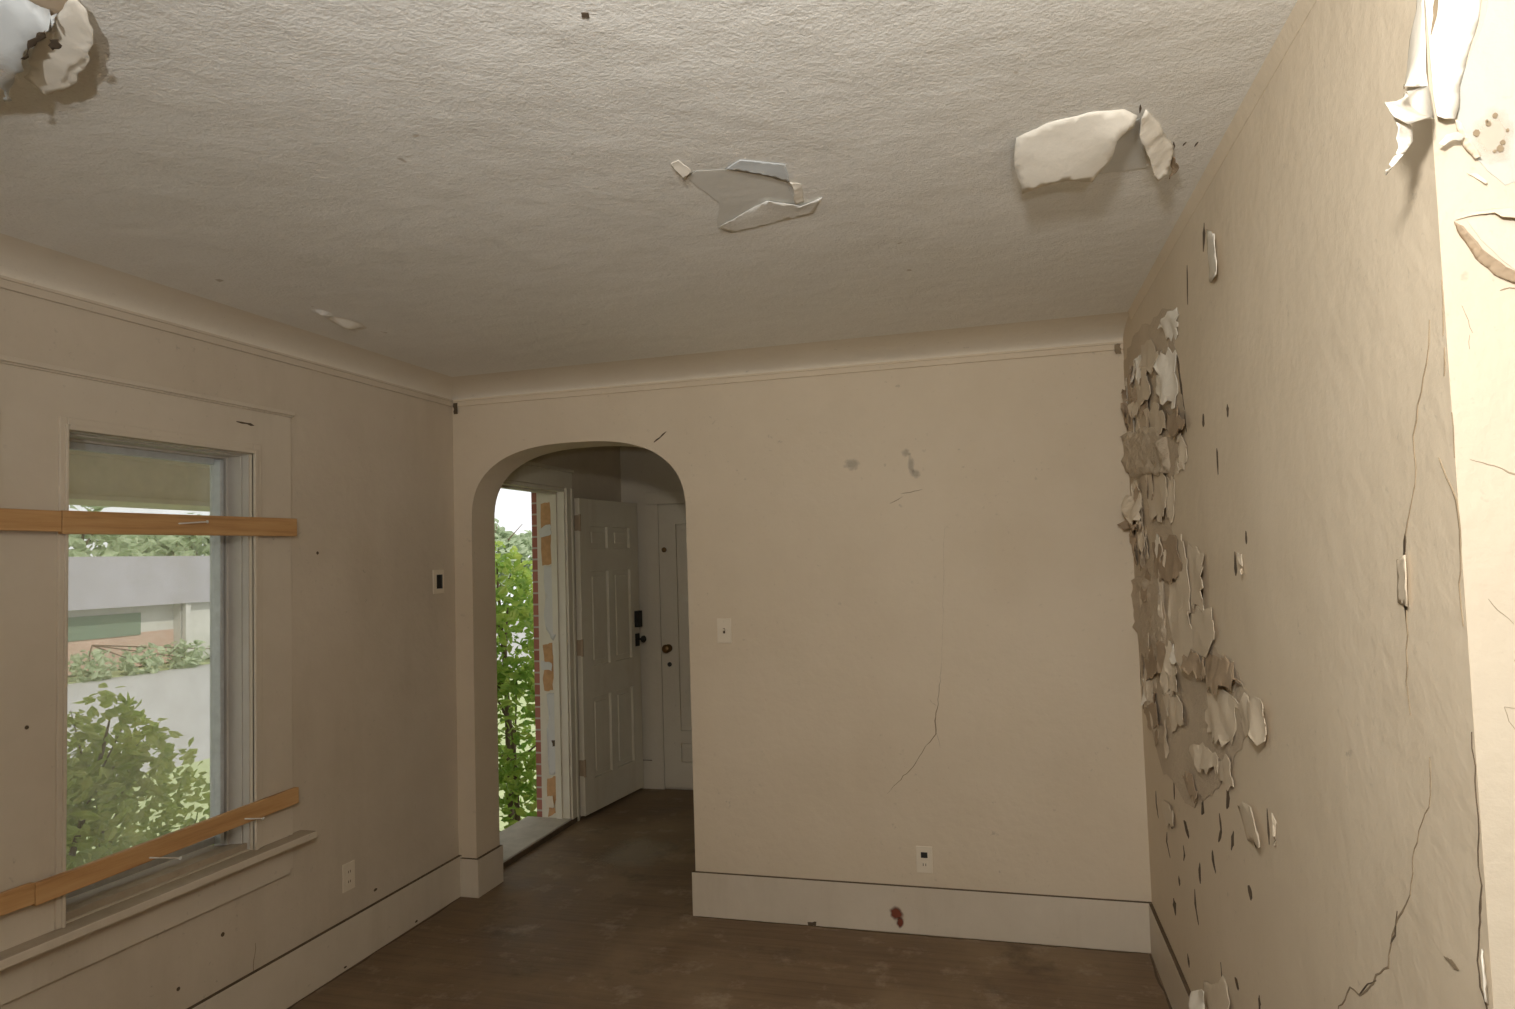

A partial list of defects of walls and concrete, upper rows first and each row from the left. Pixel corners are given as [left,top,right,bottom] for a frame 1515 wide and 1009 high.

peeling [0,0,94,102]
peeling [670,160,822,233]
peeling [1014,104,1198,194]
peeling [1384,0,1515,185]
peeling [1454,207,1515,291]
peeling [1114,308,1277,925]
crack [887,673,941,794]
crack [1338,757,1431,1009]
crack [1471,732,1489,1009]